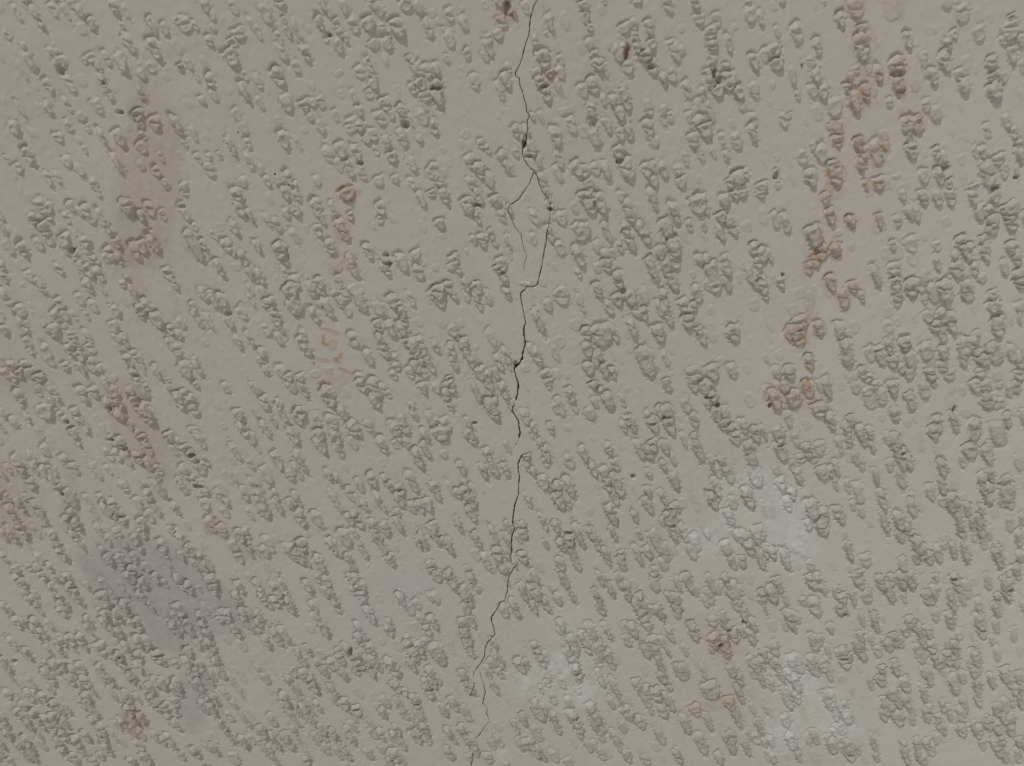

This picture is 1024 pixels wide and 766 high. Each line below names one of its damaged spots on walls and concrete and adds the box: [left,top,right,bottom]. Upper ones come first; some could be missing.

crack [470,0,551,765]